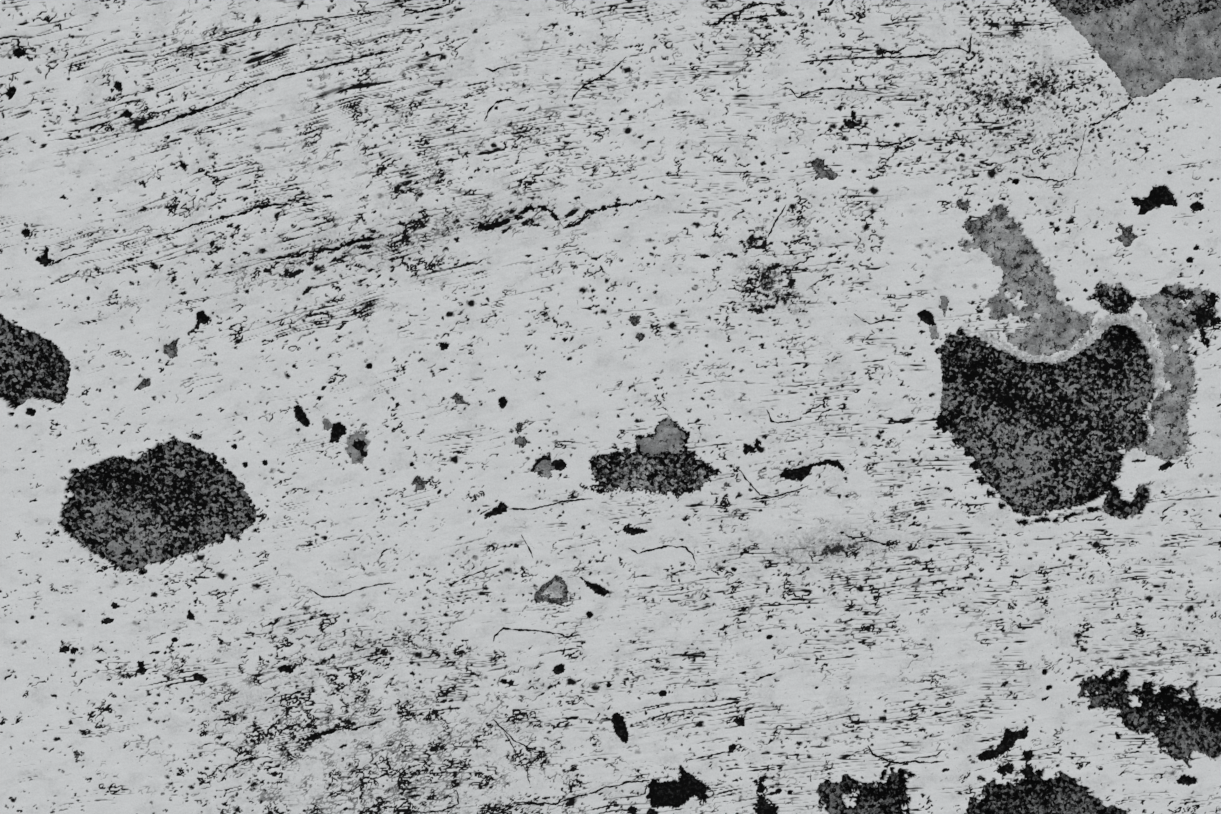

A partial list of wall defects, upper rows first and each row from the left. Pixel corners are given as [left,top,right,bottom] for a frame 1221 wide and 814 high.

spalling [1052,0,1221,98]
spalling [1115,171,1204,247]
spalling [37,247,53,266]
spalling [0,314,71,416]
spalling [918,200,1221,524]
spalling [589,417,720,497]
spalling [55,434,257,572]
spalling [628,766,708,814]
spalling [816,767,913,814]
spalling [964,726,1126,814]
spalling [1078,669,1221,785]